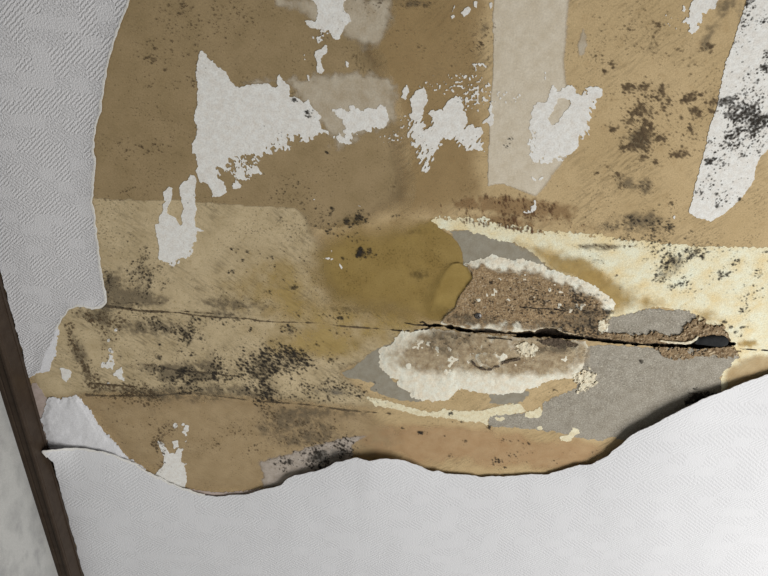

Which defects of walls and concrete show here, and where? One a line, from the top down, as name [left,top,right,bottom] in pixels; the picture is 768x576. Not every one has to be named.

water stain [93,0,471,333]
peeling [155,51,521,267]
peeling [527,72,603,164]
water stain [605,50,768,208]
peeling [689,0,768,222]
crack [109,305,310,323]
water stain [64,247,596,489]
crack [337,306,768,351]
spalling [378,254,742,402]
water stain [507,250,630,337]
water stain [726,356,768,390]
peeling [260,436,365,488]